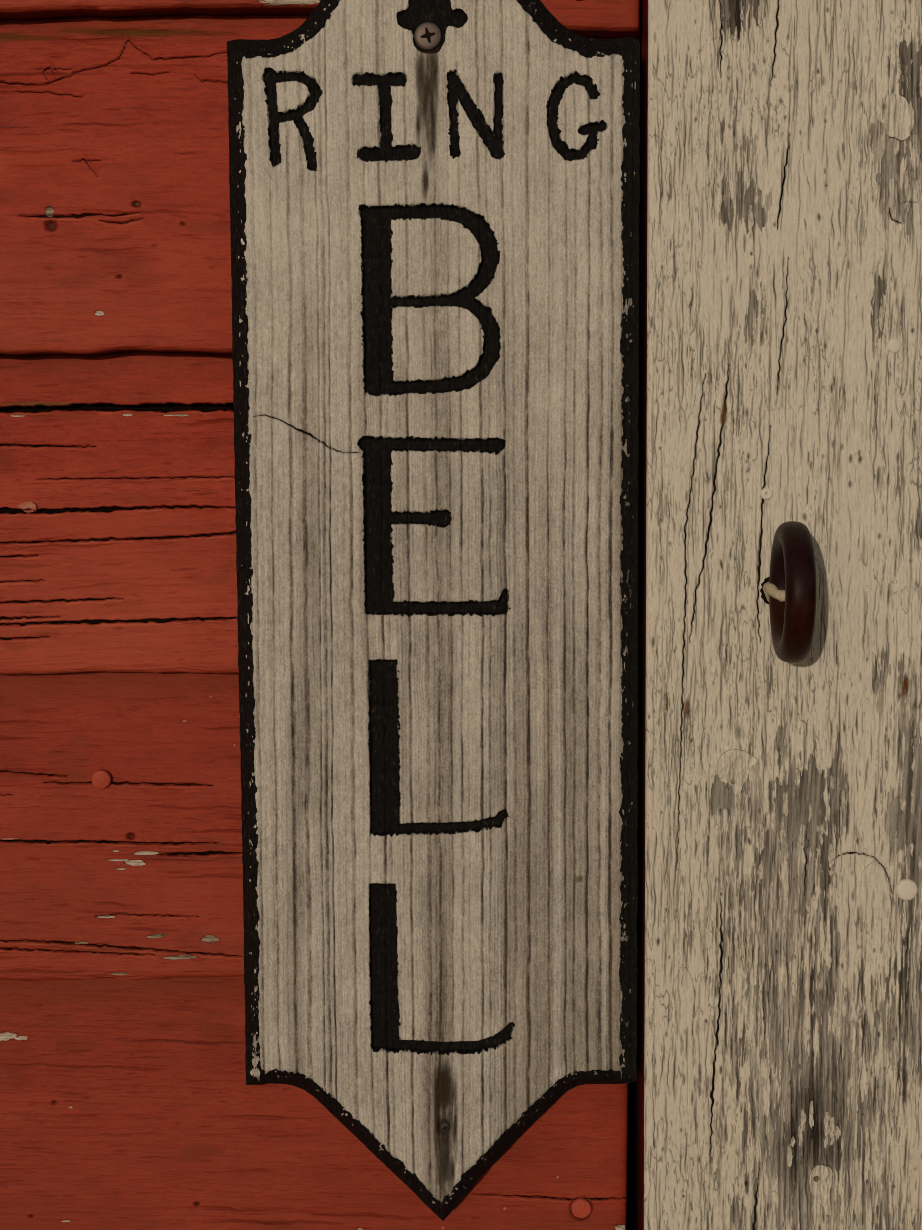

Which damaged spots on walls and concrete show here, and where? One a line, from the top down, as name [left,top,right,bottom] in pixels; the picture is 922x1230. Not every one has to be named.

crack [0,39,227,97]
peeling [720,0,766,40]
peeling [876,40,922,216]
crack [0,402,358,453]
crack [0,476,237,640]
crack [676,364,730,867]
peeling [711,749,758,816]
peeling [758,754,845,897]
peeling [885,715,922,888]
peeling [859,861,891,947]
crack [709,900,723,1163]
crack [752,1169,760,1230]